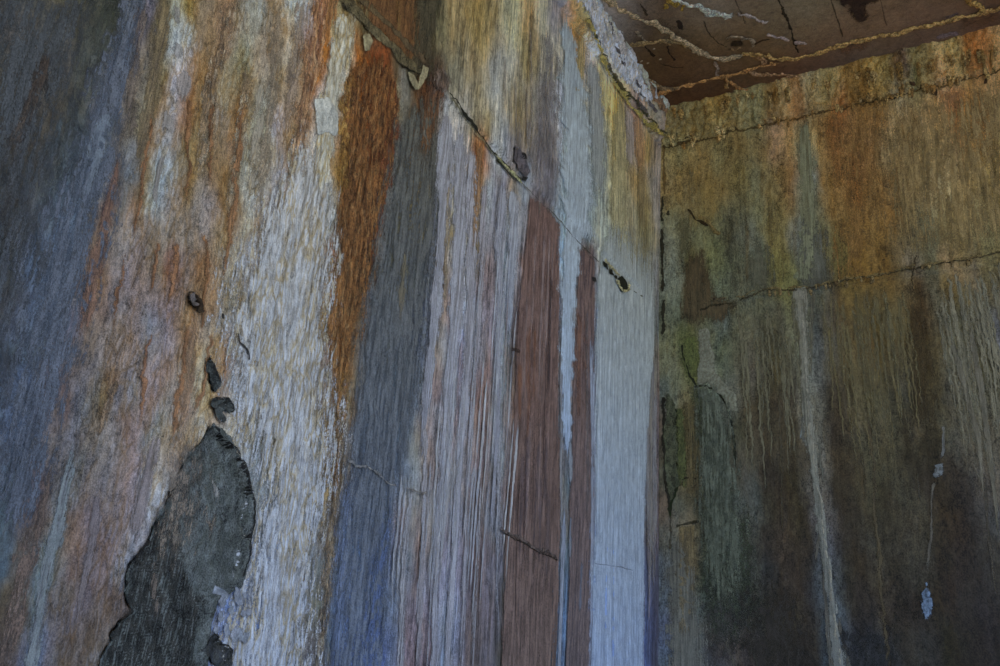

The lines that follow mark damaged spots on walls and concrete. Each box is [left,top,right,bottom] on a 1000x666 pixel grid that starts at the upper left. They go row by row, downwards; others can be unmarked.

crack [735,0,799,53]
corrosion [314,0,424,666]
spalling [513,146,530,181]
crack [450,93,599,262]
spalling [603,259,631,293]
crack [585,18,1000,385]
water stain [677,77,1000,666]
spalling [99,358,256,666]
crack [500,527,558,561]
crack [661,397,687,549]